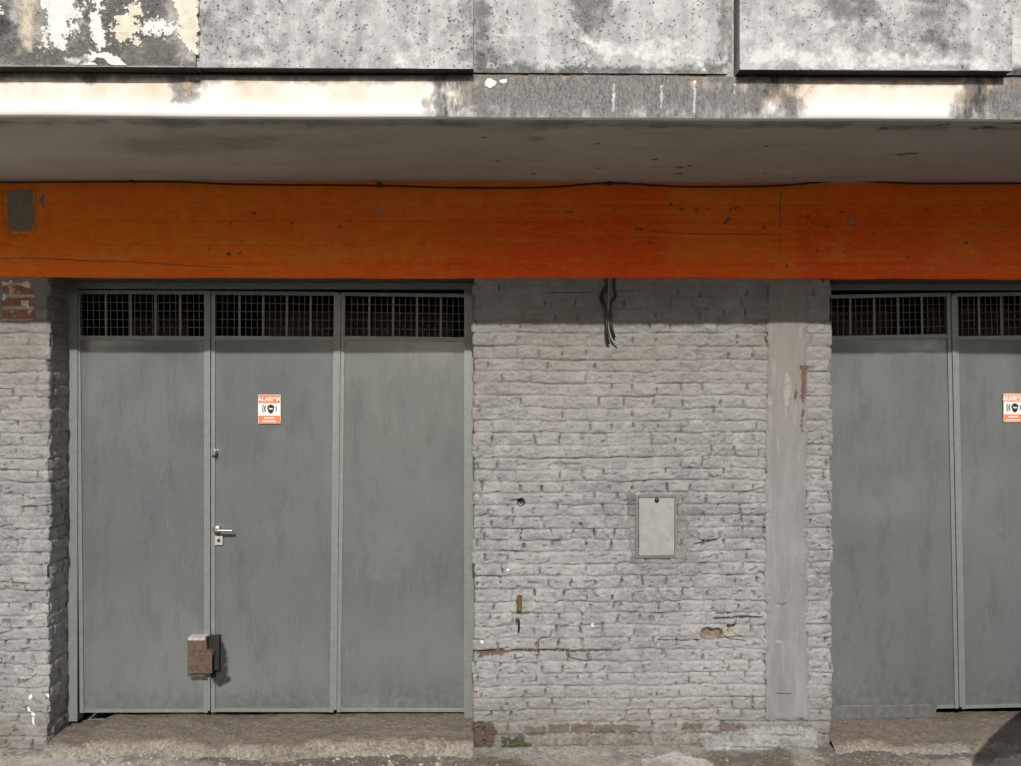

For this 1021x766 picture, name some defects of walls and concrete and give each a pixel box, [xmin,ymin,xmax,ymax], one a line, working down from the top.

peeling [15,0,201,65]
damp [432,0,1021,129]
peeling [5,188,45,232]
peeling [2,280,35,321]
rust [794,364,814,431]
spalling [700,625,739,640]